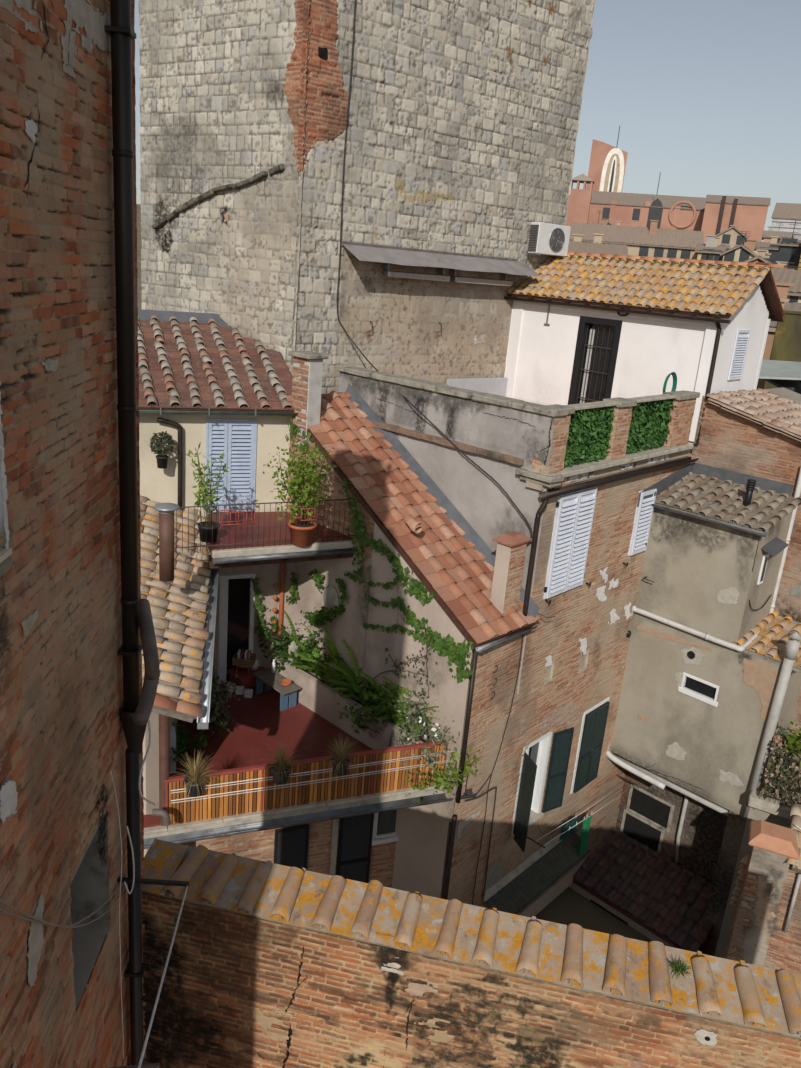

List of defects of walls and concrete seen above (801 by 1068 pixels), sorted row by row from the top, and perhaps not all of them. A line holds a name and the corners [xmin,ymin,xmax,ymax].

flaking render [0,0,43,39]
flaking render [61,0,111,79]
spalling [284,0,350,173]
flaking render [25,119,38,142]
flaking render [0,381,10,549]
crack [275,946,308,1068]
damp [373,945,407,1008]